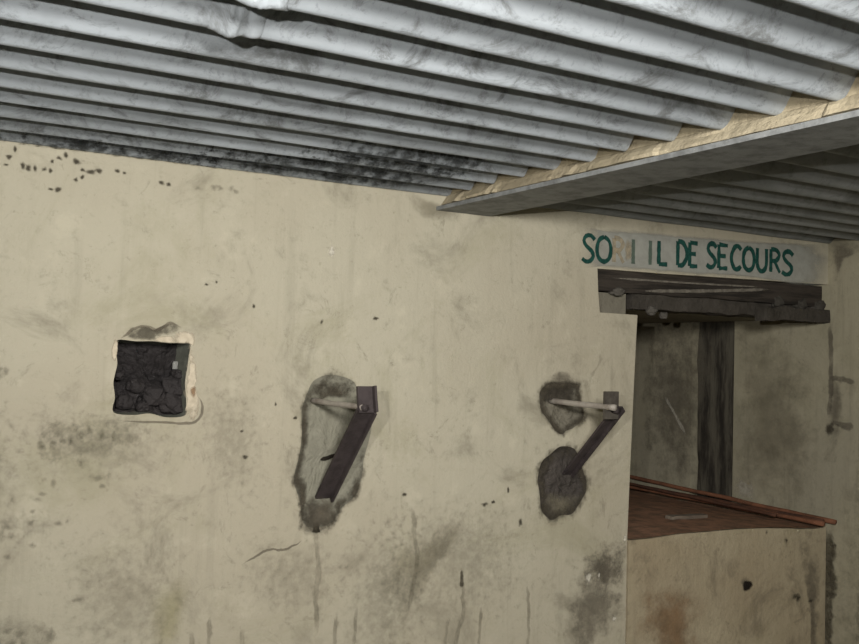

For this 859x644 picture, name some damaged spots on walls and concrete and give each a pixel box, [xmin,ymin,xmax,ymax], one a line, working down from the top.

damp [5,133,482,186]
spalling [156,332,199,418]
spalling [539,374,586,434]
spalling [293,375,372,530]
spalling [537,446,587,520]